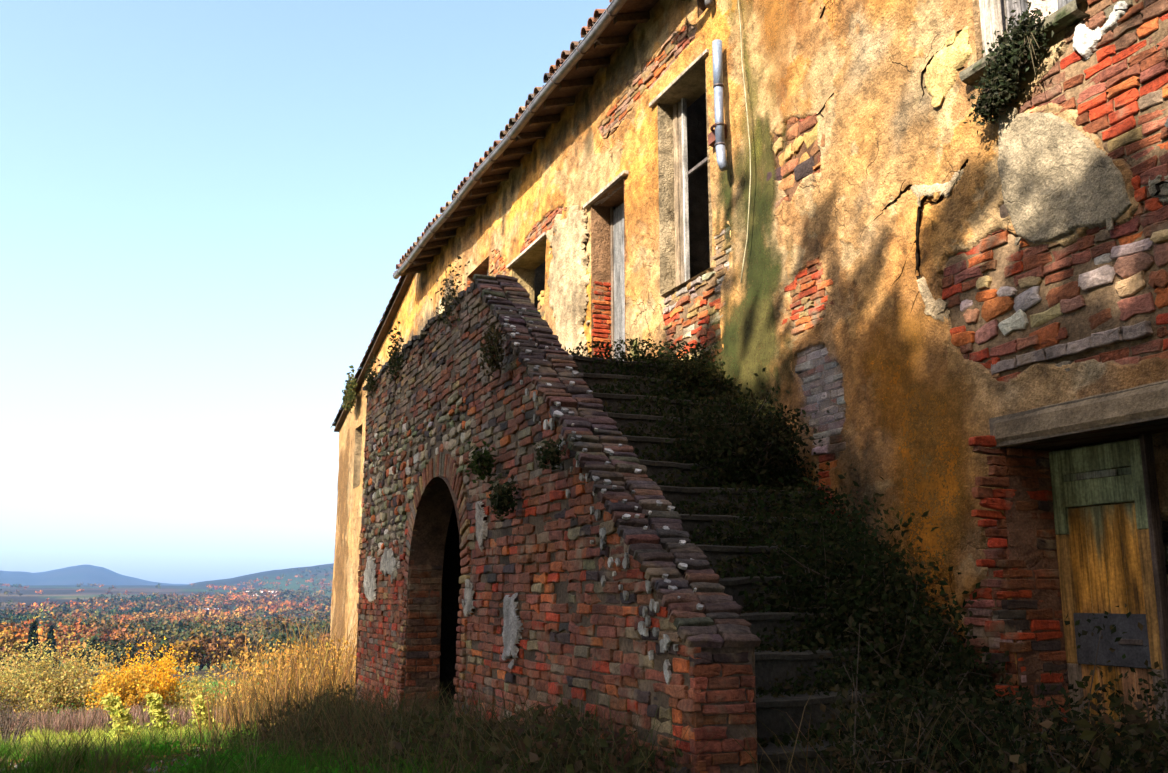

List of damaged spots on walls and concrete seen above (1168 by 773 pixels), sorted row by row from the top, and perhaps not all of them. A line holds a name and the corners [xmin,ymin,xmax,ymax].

spalling [599,14,699,142]
spalling [662,229,733,364]
spalling [766,113,825,208]
spalling [782,257,834,337]
crack [859,159,969,316]
spalling [942,0,1168,382]
spalling [795,344,848,518]